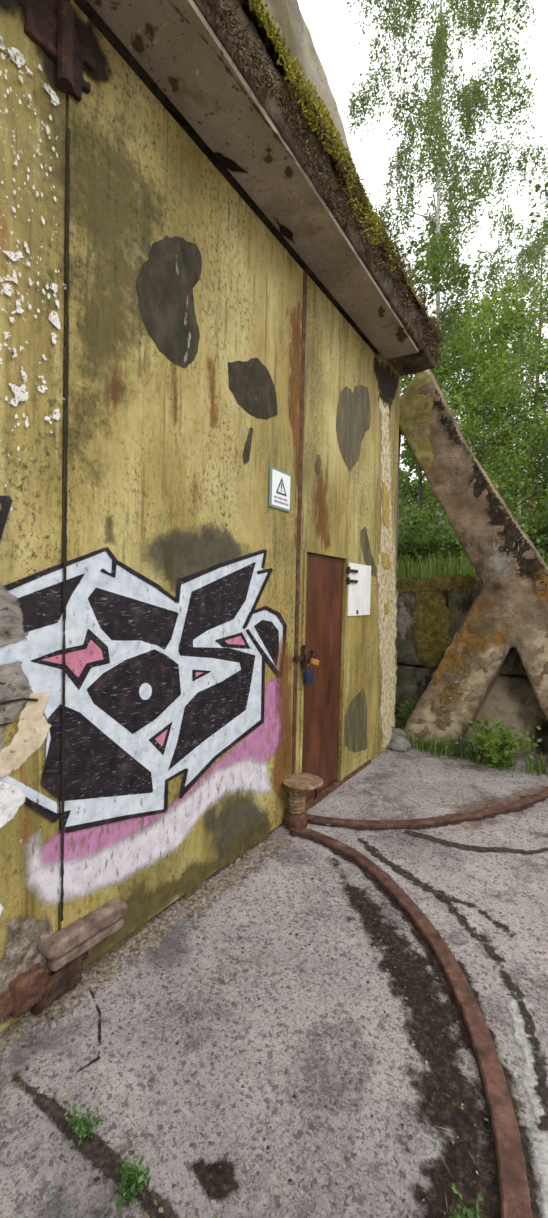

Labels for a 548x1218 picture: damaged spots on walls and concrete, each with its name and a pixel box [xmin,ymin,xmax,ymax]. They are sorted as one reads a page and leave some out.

rust [37,42,59,88]
rust [74,10,111,82]
peeling [0,35,66,431]
rust [289,304,303,544]
rust [313,472,330,548]
flaking render [0,582,25,647]
flaking render [0,661,51,828]
spalling [0,832,293,1066]